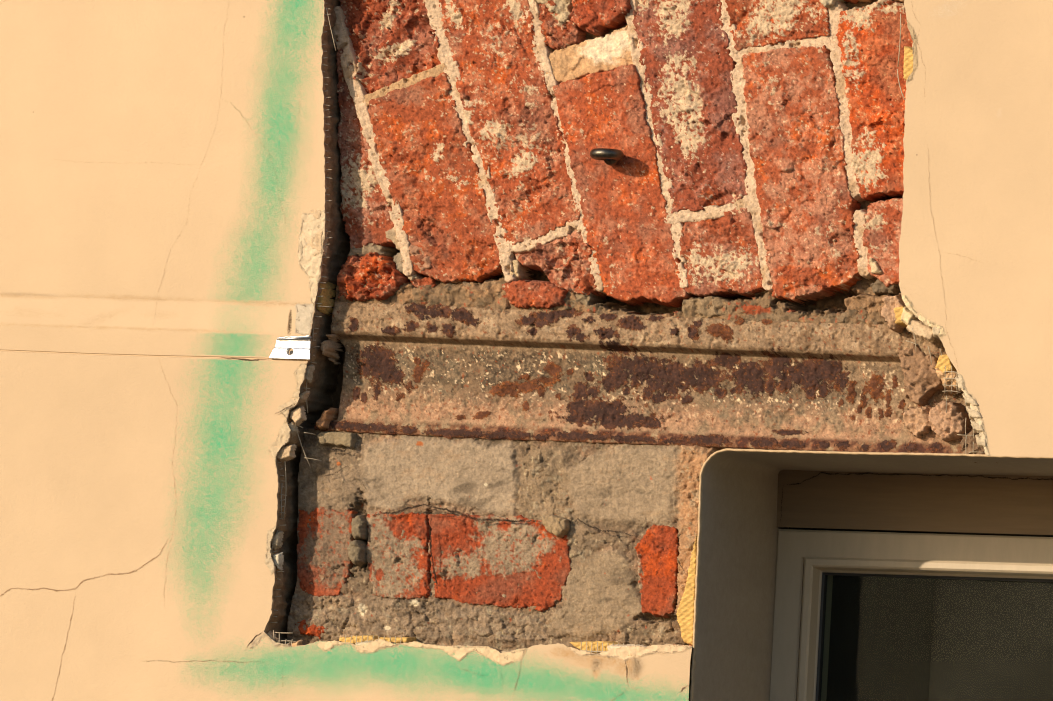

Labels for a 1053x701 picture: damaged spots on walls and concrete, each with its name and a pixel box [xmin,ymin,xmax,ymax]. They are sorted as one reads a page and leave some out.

flaking render [907,20,918,81]
flaking render [294,210,328,335]
flaking render [900,295,946,342]
flaking render [268,362,315,475]
peeling [317,432,357,449]
flaking render [955,373,990,456]
crack [0,370,178,701]
flaking render [265,526,284,573]
flaking render [248,631,303,649]
flaking render [563,644,692,662]